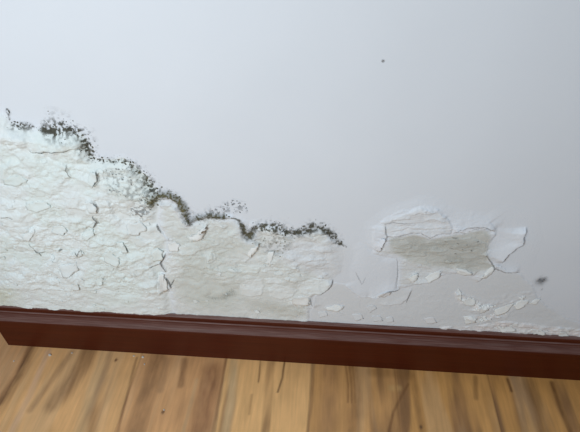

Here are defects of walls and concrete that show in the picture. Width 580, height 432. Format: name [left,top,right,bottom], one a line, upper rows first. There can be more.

leakage [7,109,344,257]
peeling [0,104,580,337]